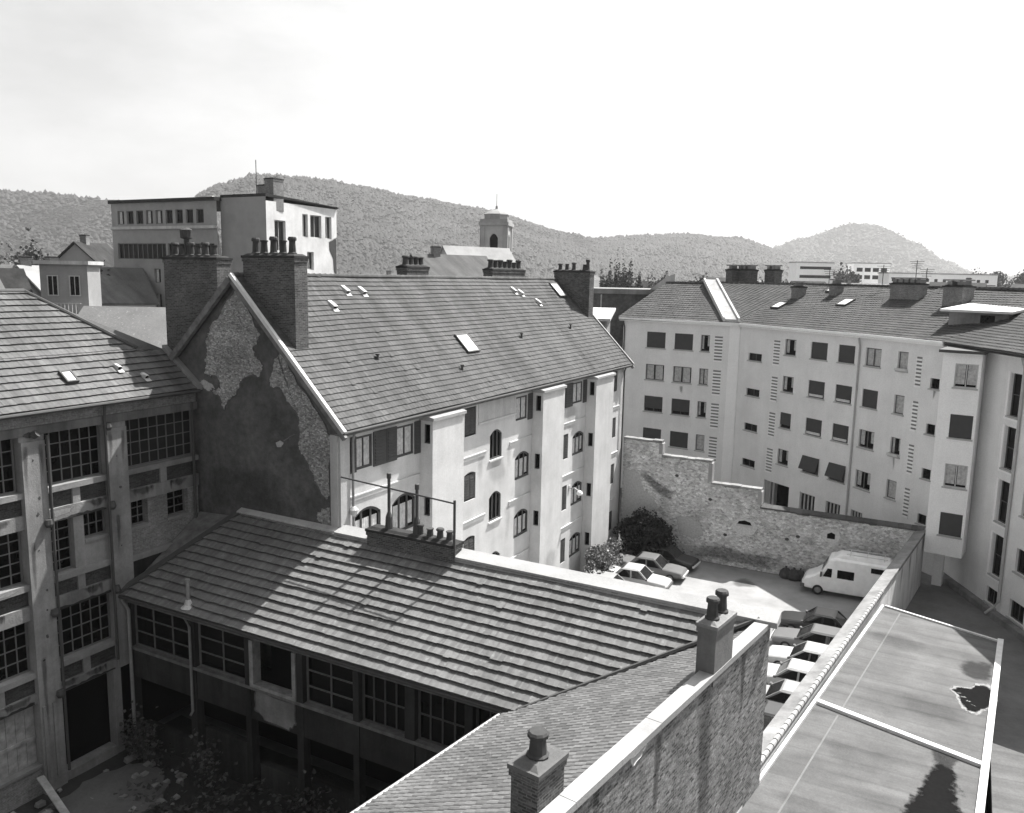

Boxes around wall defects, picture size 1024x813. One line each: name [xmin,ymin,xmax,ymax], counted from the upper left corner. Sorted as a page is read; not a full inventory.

peeling [200,290,331,525]
leakage [948,661,998,715]